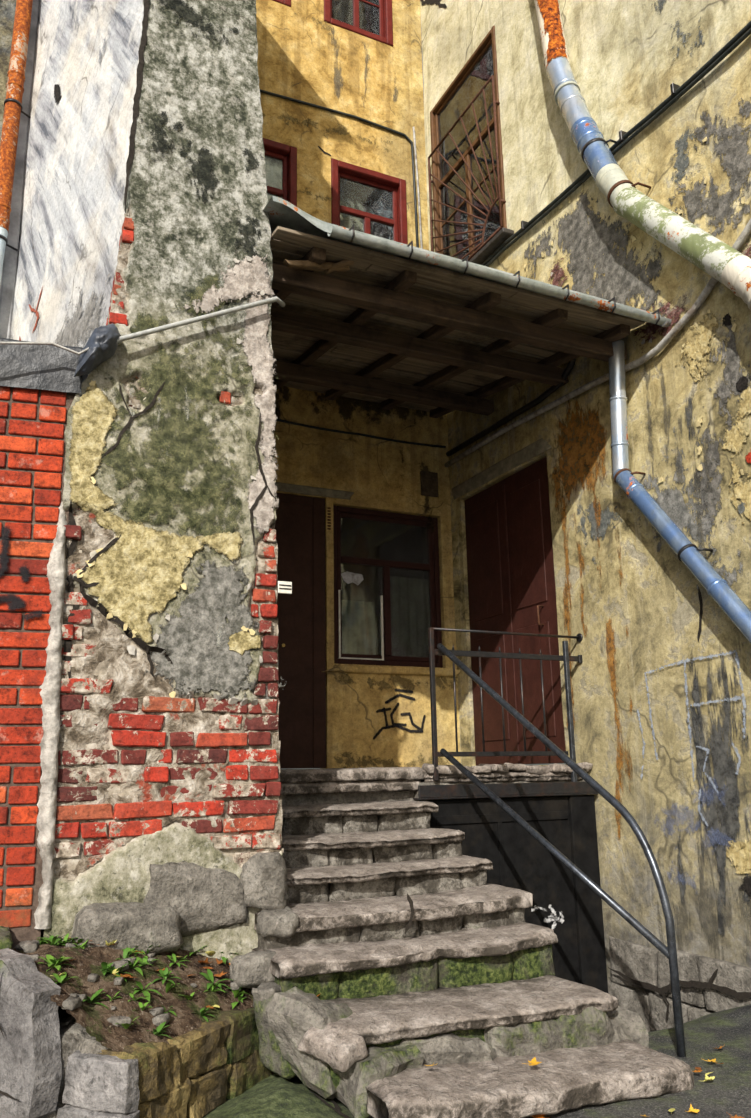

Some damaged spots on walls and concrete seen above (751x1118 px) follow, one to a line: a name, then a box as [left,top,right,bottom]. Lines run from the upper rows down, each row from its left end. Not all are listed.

crack [420,0,447,8]
corrosion [537,0,567,63]
peeling [667,98,751,242]
peeling [524,185,751,592]
crack [250,413,275,545]
spalling [53,254,287,880]
corrosion [552,400,615,727]
leakage [658,651,751,960]
crack [608,967,751,1019]